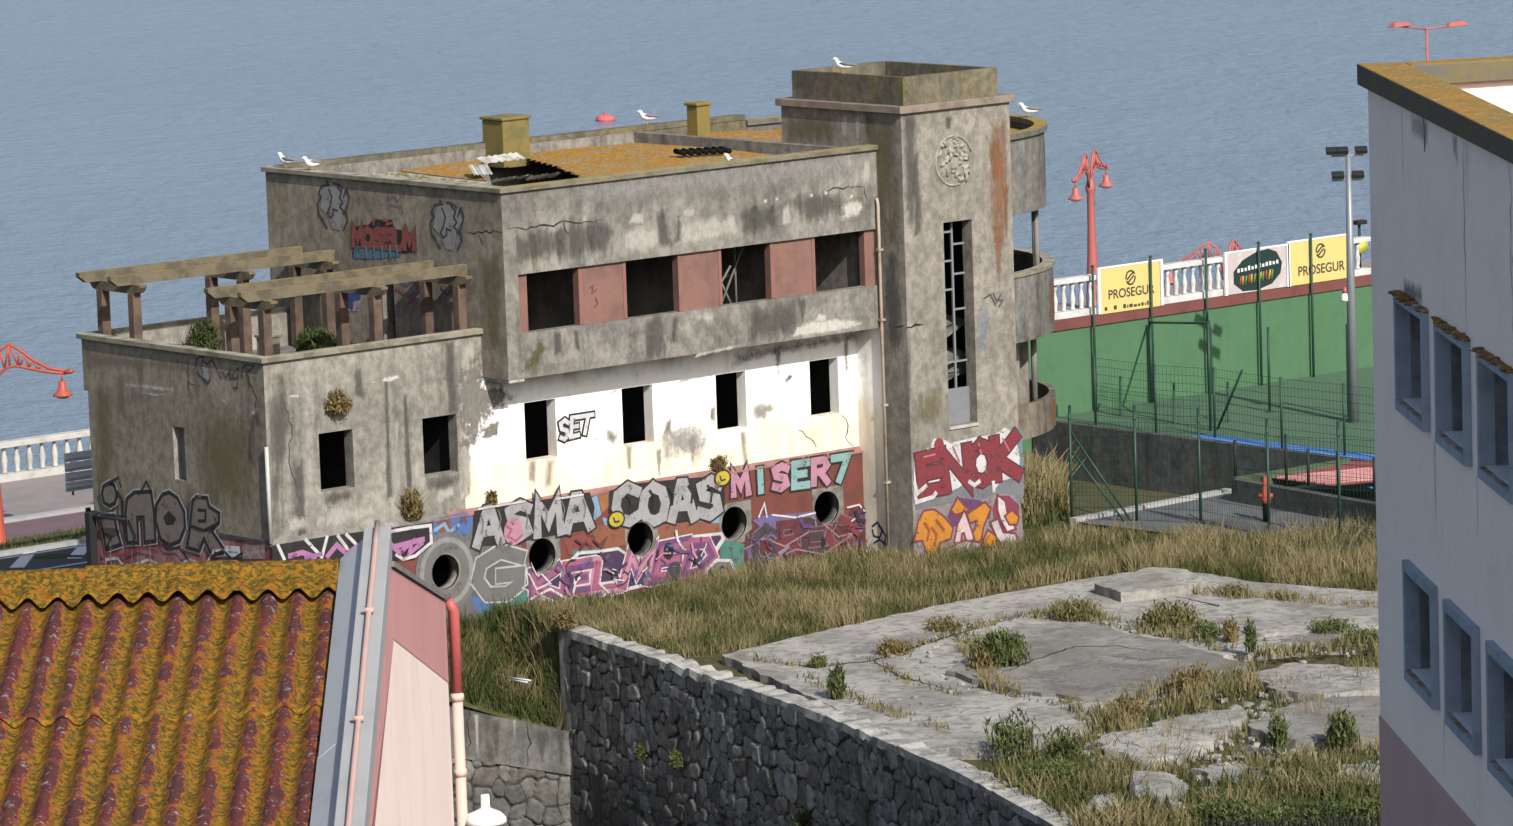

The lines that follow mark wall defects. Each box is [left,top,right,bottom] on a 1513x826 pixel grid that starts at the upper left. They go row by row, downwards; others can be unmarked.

crack [467,219,603,244]
damp [517,222,609,258]
damp [576,157,844,244]
corrosion [991,125,1007,272]
crack [1505,164,1513,330]
peeling [456,340,524,503]
damp [657,408,715,468]